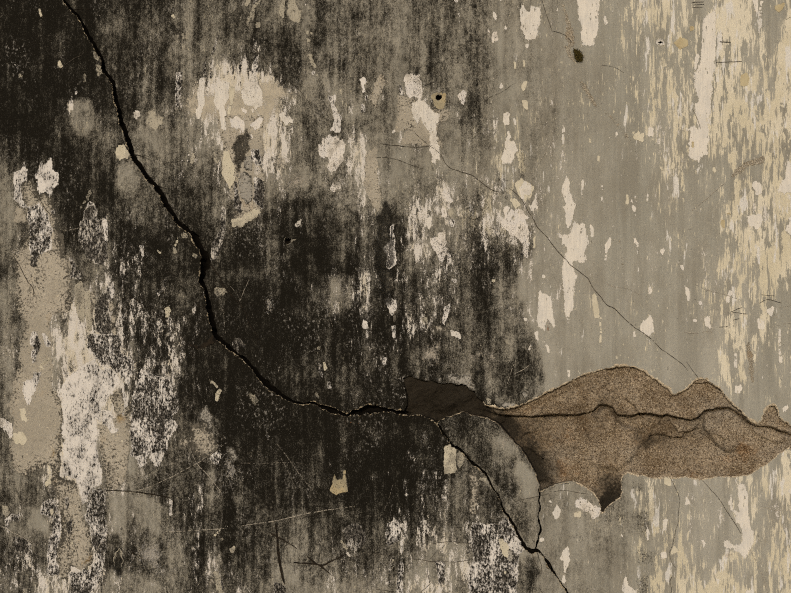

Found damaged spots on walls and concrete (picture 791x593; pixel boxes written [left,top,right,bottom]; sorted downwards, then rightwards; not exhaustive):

peeling [175,31,294,261]
crack [60,0,411,432]
damp [375,201,395,307]
peeling [392,73,453,165]
crack [377,133,698,377]
peeling [558,176,594,324]
damp [113,548,124,577]
peeling [0,158,239,593]
crack [105,490,168,498]
crack [269,523,346,584]
crack [436,420,585,593]
spalling [403,356,791,558]